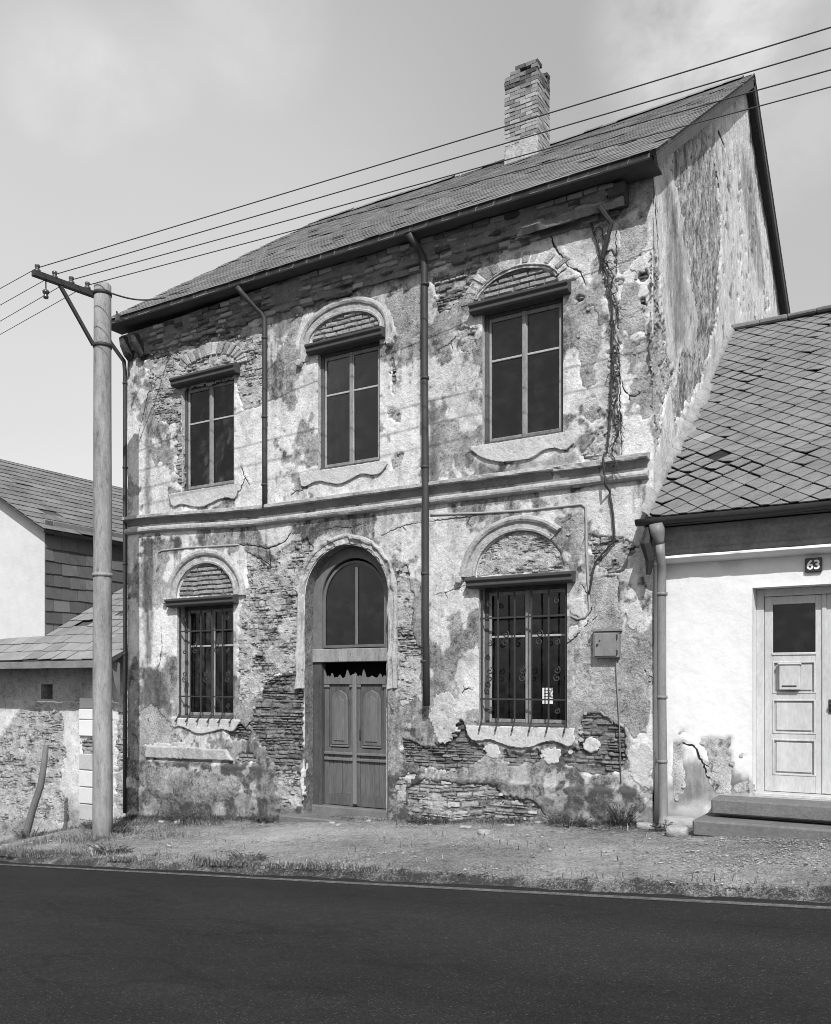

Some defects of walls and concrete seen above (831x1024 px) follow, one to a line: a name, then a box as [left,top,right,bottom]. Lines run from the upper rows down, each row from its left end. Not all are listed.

crack [534,236,586,285]
spalling [148,323,262,487]
crack [240,531,292,566]
spalling [226,539,314,810]
spalling [562,515,653,775]
spalling [0,704,70,823]
spalling [395,720,544,821]
spalling [671,731,686,801]
crack [682,742,710,779]
spalling [700,737,756,796]